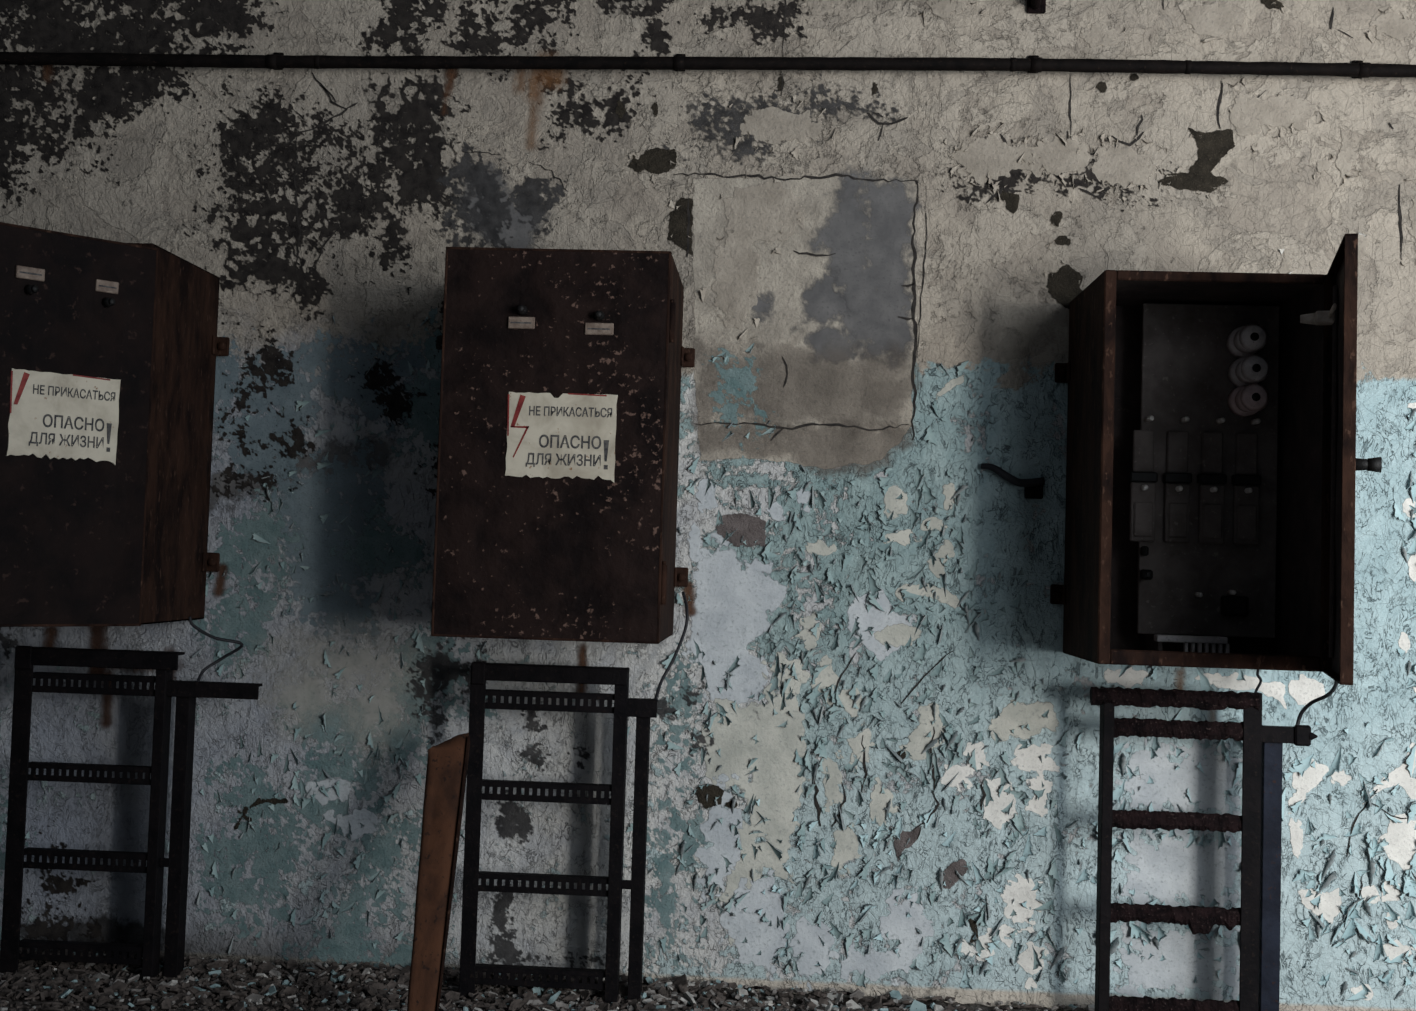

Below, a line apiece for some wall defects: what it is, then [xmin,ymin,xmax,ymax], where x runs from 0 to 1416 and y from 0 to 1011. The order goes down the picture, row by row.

peeling [729,71,835,160]
spalling [627,147,680,184]
peeling [944,122,1235,214]
spalling [667,197,694,255]
spalling [1044,211,1083,309]
peeling [700,173,805,459]
peeling [1394,452,1416,703]
rust [90,626,108,649]
rust [89,667,151,727]
peeling [626,457,1243,1001]
peeling [1195,667,1325,709]
peeling [1282,728,1416,1001]